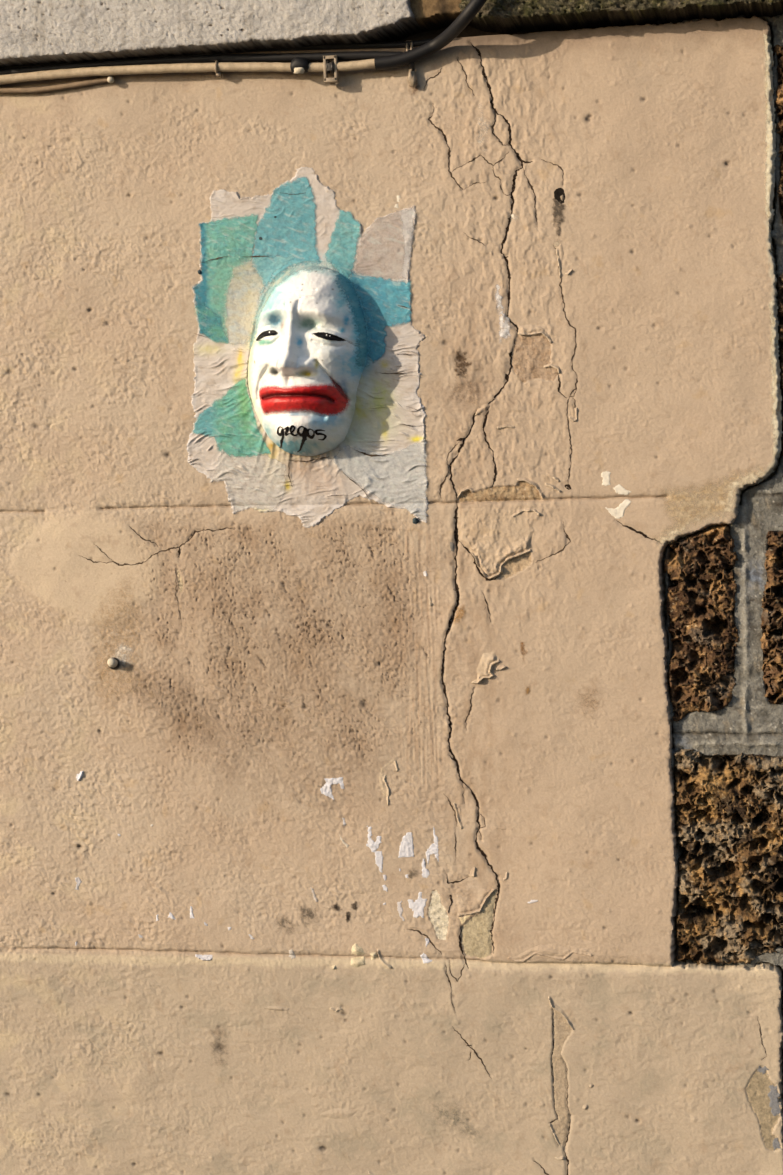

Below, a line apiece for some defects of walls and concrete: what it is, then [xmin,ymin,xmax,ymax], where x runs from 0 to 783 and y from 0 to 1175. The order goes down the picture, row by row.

crack [554,247,578,490]
crack [83,526,235,628]
crack [408,42,564,1079]
peeling [457,477,561,580]
crack [537,522,571,561]
spalling [428,862,508,958]
crack [534,1015,571,1175]